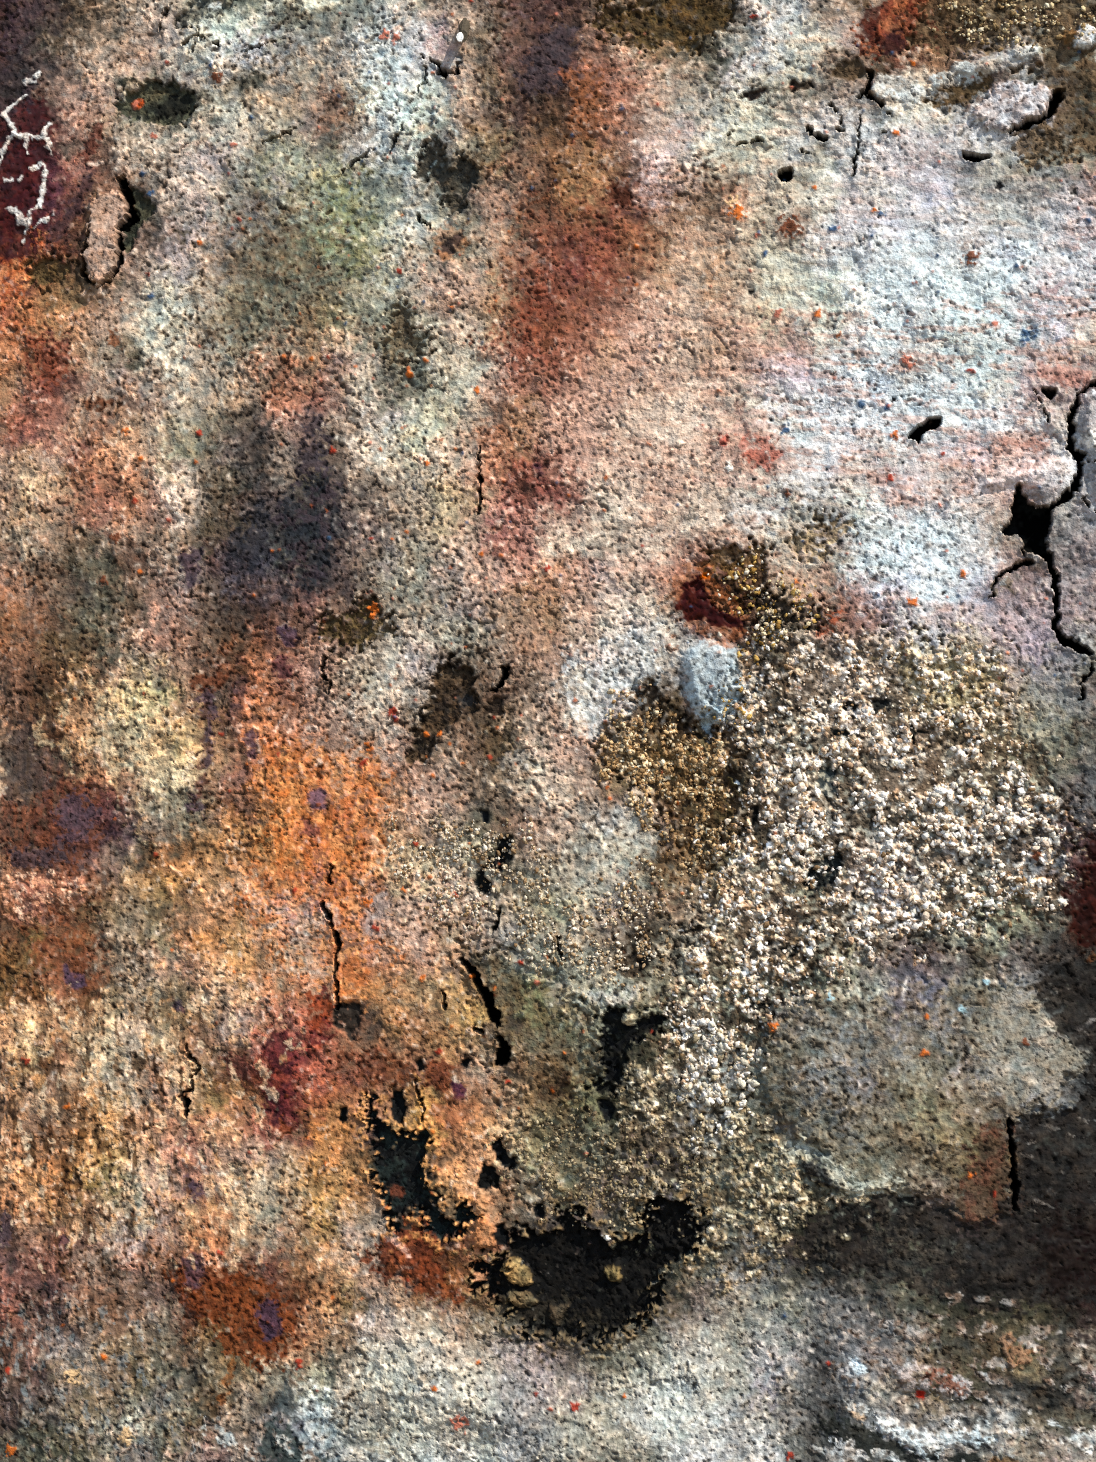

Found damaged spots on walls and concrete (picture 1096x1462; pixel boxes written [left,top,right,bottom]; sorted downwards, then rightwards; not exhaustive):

crack [0,30,140,289]
flaking render [20,185,156,296]
flaking render [172,224,194,255]
corrosion [429,57,692,398]
crack [988,379,1096,702]
damp [542,587,685,765]
crack [319,863,342,1011]
corrosion [182,665,484,1142]
damp [469,919,647,1013]
damp [531,795,671,899]
spalling [383,504,1096,1299]
corrosion [160,1250,303,1411]